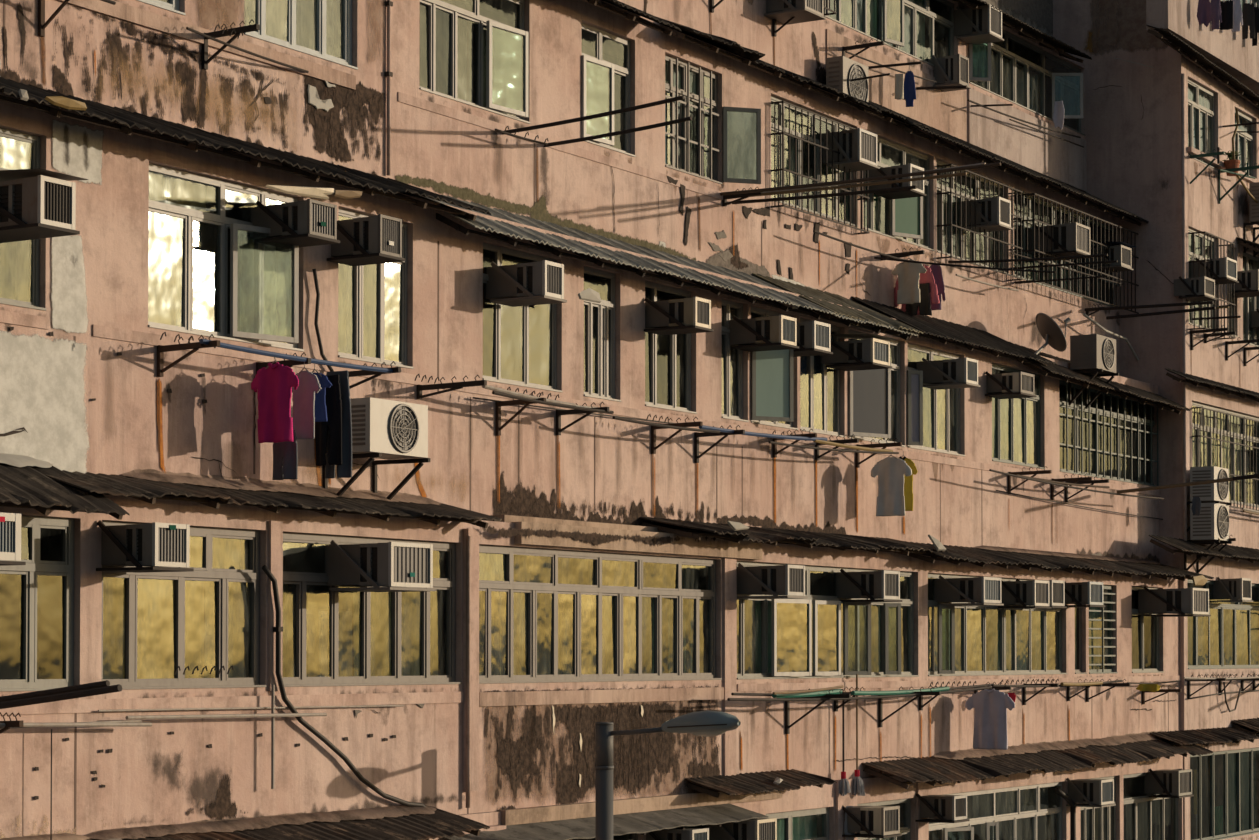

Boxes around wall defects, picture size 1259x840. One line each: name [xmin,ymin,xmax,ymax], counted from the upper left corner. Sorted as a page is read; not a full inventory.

water stain [0,0,387,175]
peeling [308,80,336,112]
peeling [0,235,96,473]
water stain [480,471,846,547]
water stain [155,755,245,820]
water stain [485,685,720,810]